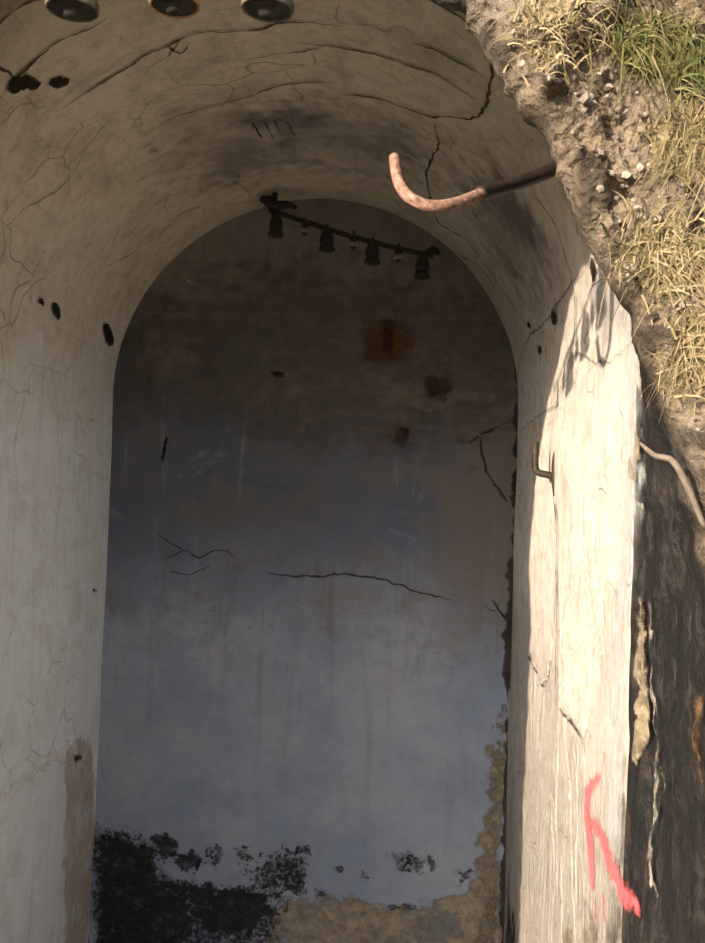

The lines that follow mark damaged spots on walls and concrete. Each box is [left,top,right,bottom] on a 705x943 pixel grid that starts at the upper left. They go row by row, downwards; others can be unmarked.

crack [0,0,39,24]
crack [430,0,466,22]
crack [0,19,105,98]
crack [57,22,524,324]
crack [508,154,575,415]
rust [365,320,415,364]
crack [157,534,235,575]
crack [265,572,453,601]
water stain [88,822,327,943]
peeling [265,746,507,943]
water stain [391,850,438,874]
water stain [459,723,515,943]